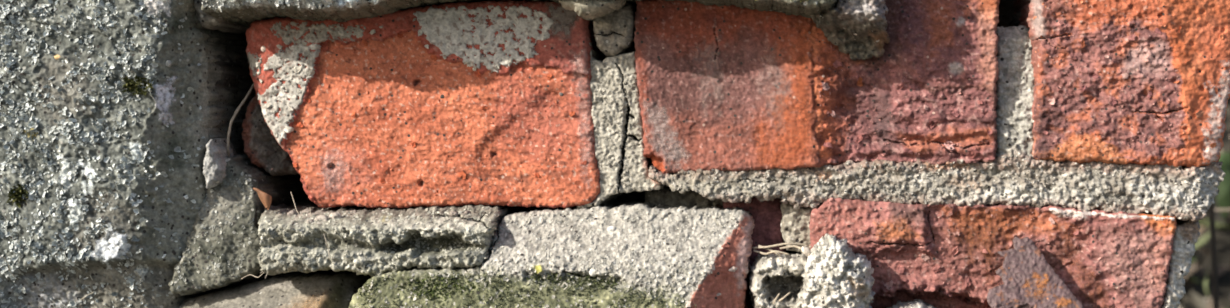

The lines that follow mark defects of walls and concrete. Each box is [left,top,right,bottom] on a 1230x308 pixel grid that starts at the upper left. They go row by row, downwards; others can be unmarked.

crack [577,32,668,209]